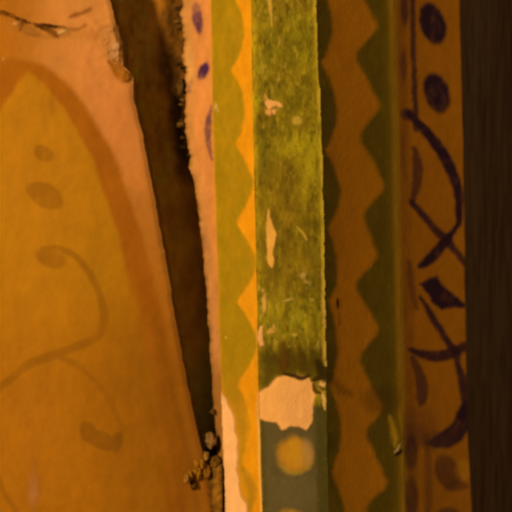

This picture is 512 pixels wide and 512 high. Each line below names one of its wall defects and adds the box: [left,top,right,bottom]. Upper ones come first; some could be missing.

crack [2,12,66,37]
spalling [100,24,131,82]
peeling [264,94,282,115]
peeling [266,209,276,268]
peeling [257,372,326,430]
peeling [183,393,247,512]